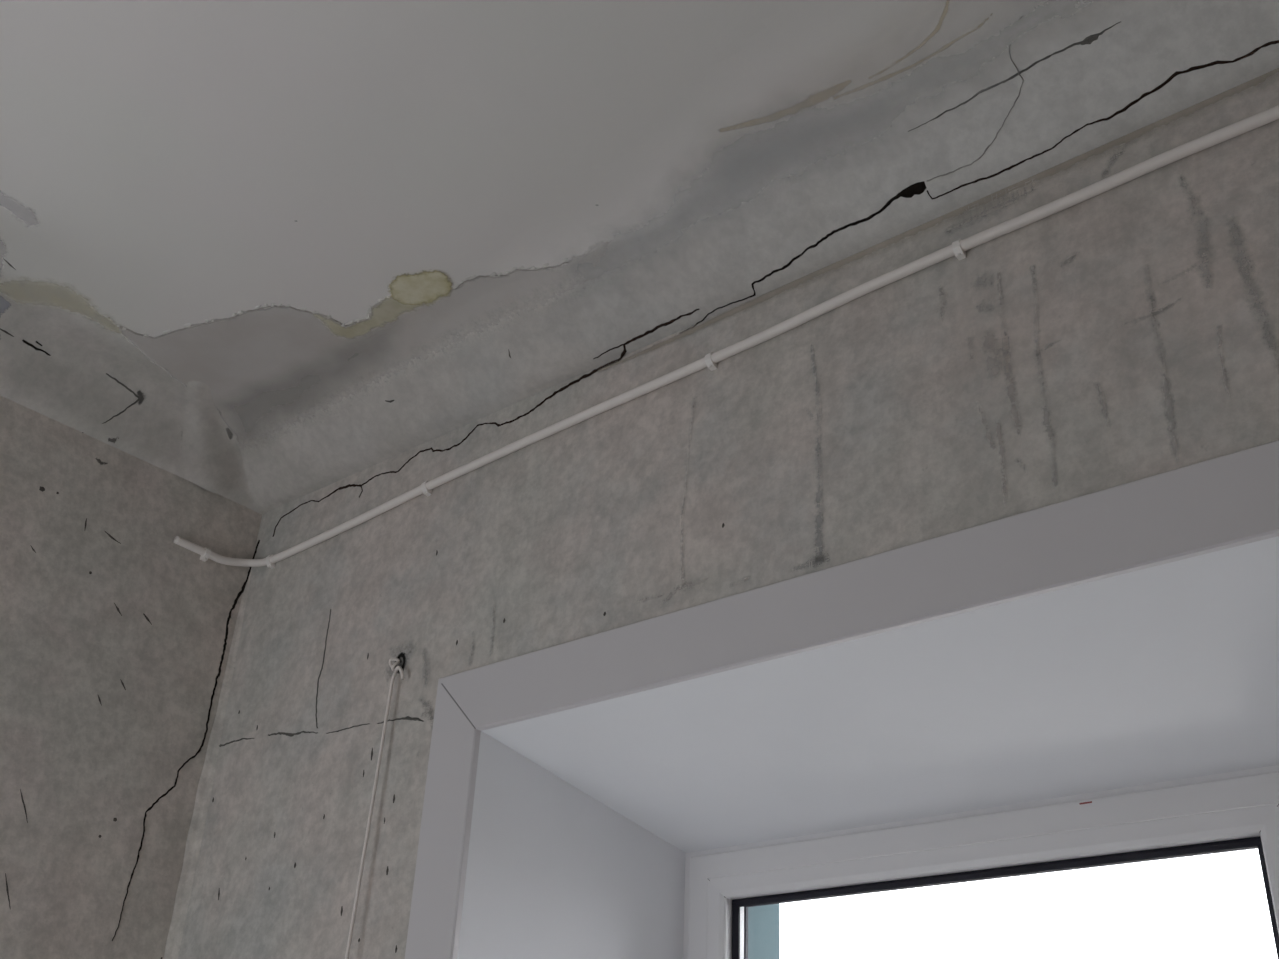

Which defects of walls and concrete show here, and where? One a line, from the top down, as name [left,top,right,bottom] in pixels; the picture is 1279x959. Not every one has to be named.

damp [720,0,992,132]
flaking render [899,181,926,198]
crack [908,15,1279,199]
flaking render [116,243,620,448]
crack [112,193,900,941]
spalling [395,652,407,674]